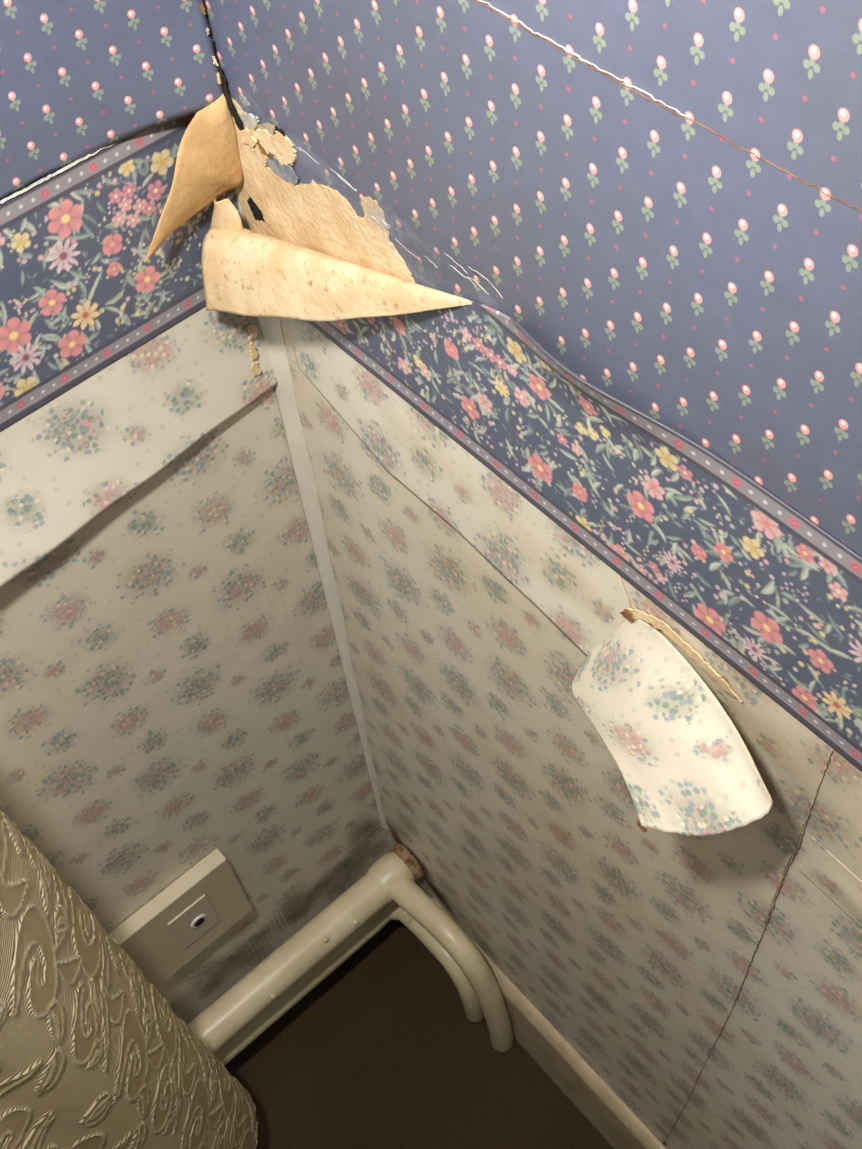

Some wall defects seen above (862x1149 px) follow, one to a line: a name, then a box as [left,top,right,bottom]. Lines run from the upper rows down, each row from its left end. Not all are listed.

crack [199,0,222,84]
crack [474,0,862,211]
peeling [144,94,474,377]
corrosion [388,825,452,912]
crack [664,751,833,1142]